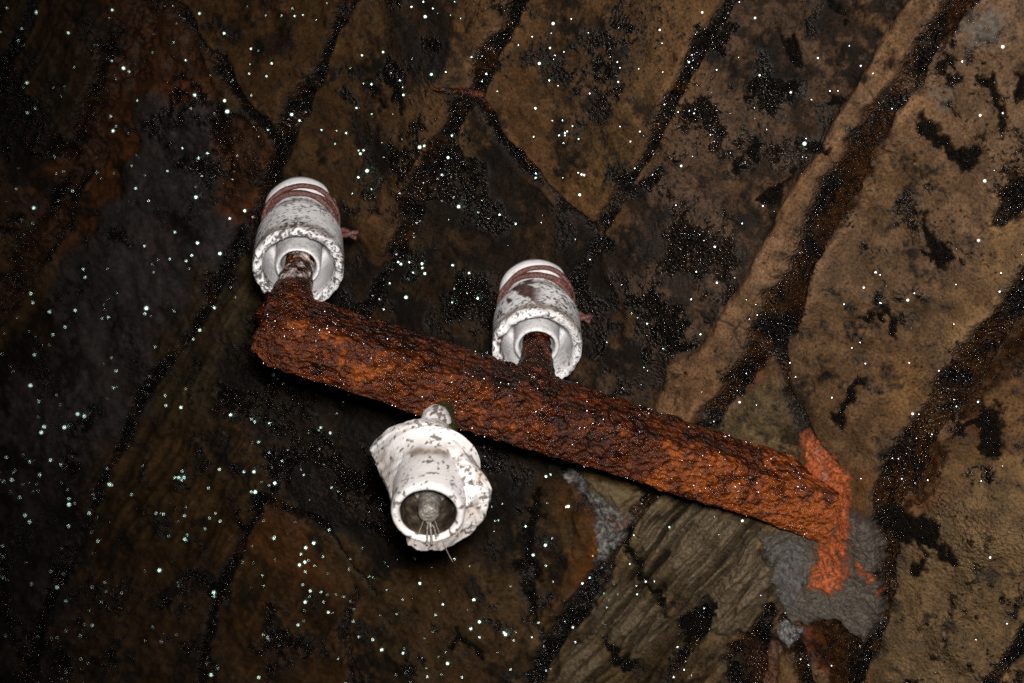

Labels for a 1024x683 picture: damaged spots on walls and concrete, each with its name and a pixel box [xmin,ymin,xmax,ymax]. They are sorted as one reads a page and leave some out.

damp [768,28,803,100]
damp [755,138,831,206]
rust [816,109,894,246]
damp [916,112,985,172]
damp [917,209,955,270]
damp [857,305,897,339]
rust [261,518,294,556]
crack [512,487,547,582]
rust [801,432,874,595]
crack [624,528,669,620]
crack [447,626,484,661]
damp [767,620,805,661]